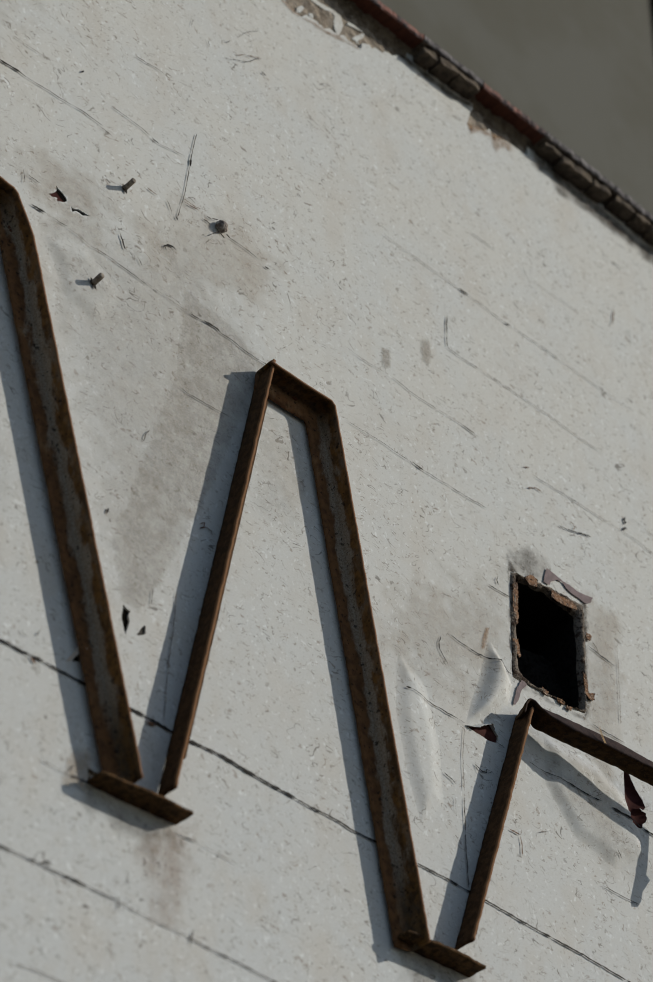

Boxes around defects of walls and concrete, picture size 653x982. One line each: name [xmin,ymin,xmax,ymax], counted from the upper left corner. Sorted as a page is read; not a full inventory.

flaking render [285,0,406,57]
peeling [544,569,593,603]
crack [0,639,85,686]
crack [439,636,511,674]
spalling [516,624,539,655]
peeling [514,680,527,705]
crack [130,707,376,842]
crack [530,762,653,835]
crack [0,845,277,982]
crack [417,863,630,982]